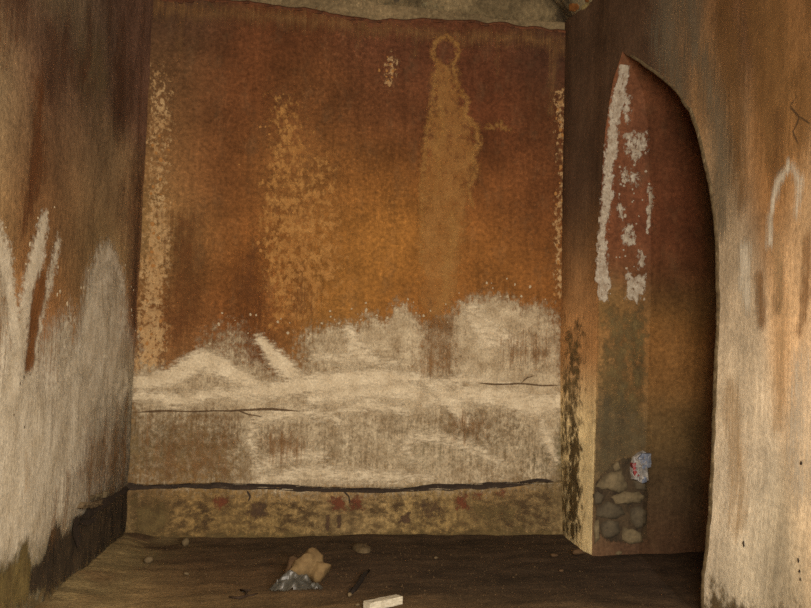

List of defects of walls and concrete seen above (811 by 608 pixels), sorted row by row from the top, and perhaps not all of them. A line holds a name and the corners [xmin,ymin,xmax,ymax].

leakage [25,272,45,372]
leakage [388,320,584,539]
leakage [597,305,649,470]
peeling [593,55,720,608]
crack [73,478,554,548]